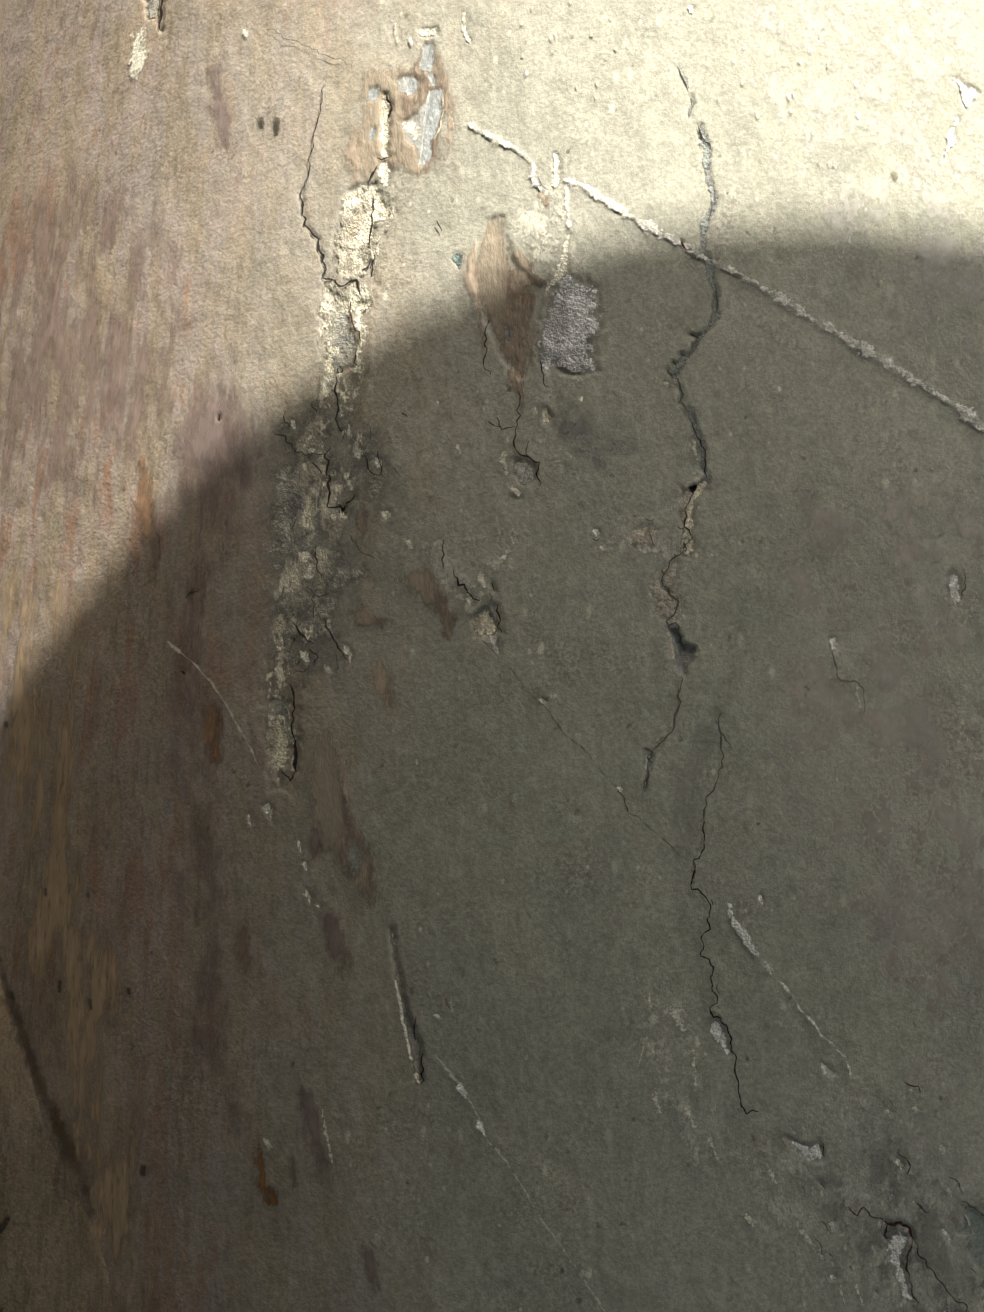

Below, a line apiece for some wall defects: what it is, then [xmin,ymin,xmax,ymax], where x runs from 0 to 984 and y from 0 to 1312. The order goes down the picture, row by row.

spalling [128,0,164,79]
peeling [340,27,444,277]
peeling [944,77,977,155]
crack [663,63,721,480]
spalling [324,293,370,391]
crack [488,372,551,485]
peeling [258,401,392,674]
crack [661,537,693,624]
spalling [267,684,298,781]
crack [643,675,683,795]
crack [690,713,759,1115]
crack [848,1152,968,1312]